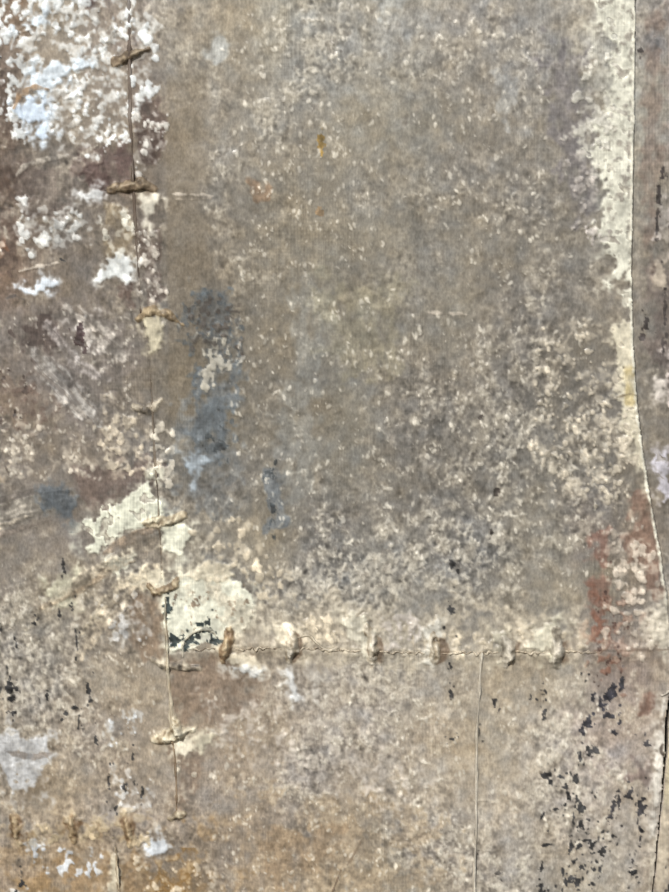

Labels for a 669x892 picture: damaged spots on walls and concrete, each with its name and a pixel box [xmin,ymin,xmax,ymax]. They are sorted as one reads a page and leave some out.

peeling [0,0,170,175]
peeling [0,176,171,309]
peeling [0,292,480,892]
rust [579,523,635,688]
rust [623,487,663,596]
crack [631,646,669,654]
crack [658,742,666,757]